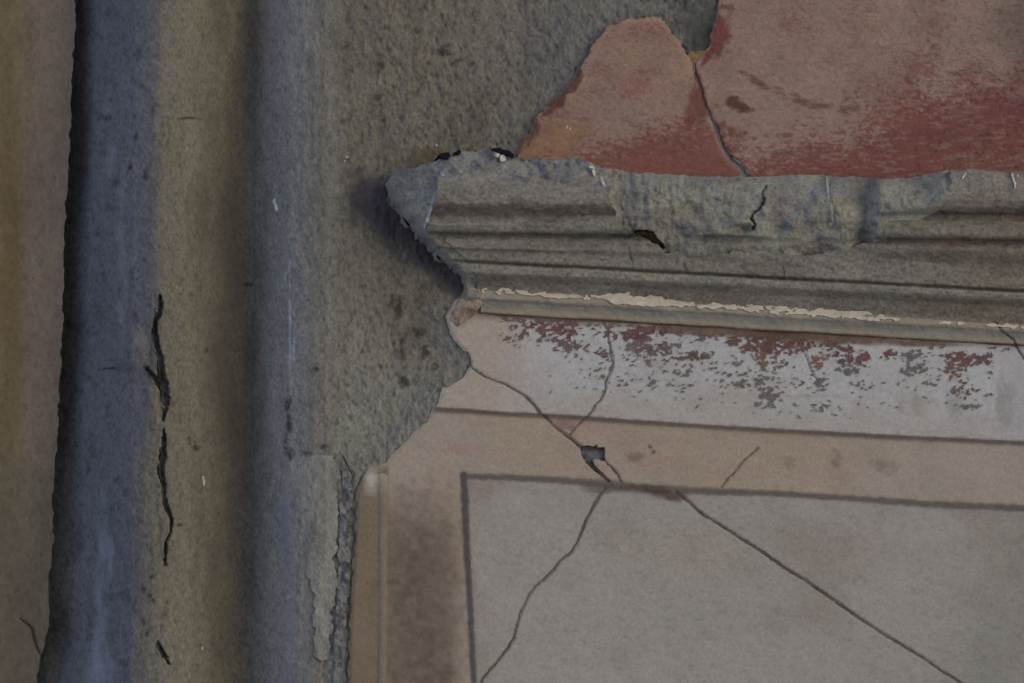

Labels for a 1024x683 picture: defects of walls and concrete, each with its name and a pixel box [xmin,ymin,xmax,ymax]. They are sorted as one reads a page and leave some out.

peeling [524,74,583,148]
spalling [385,159,900,326]
peeling [702,4,733,66]
crack [687,50,766,228]
peeling [727,96,750,112]
spalling [604,167,954,257]
crack [143,296,173,566]
peeling [285,401,354,683]
crack [471,337,621,683]
peeling [500,316,1010,420]
crack [676,492,961,683]